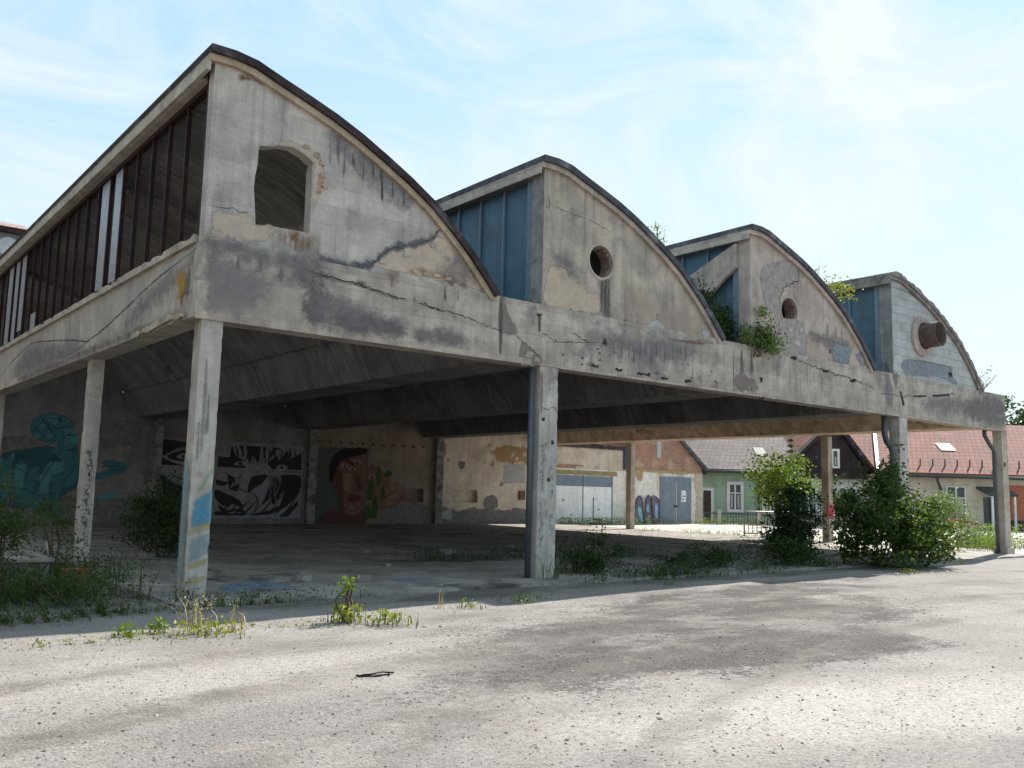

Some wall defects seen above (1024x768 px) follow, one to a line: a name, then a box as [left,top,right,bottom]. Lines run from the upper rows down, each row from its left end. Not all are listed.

spalling [270,140,328,208]
water stain [330,135,411,208]
water stain [207,241,403,337]
crack [310,271,513,335]
peeling [543,265,603,314]
peeling [760,259,808,356]
spalling [517,336,542,367]
crack [791,356,950,405]
peeling [483,443,527,467]